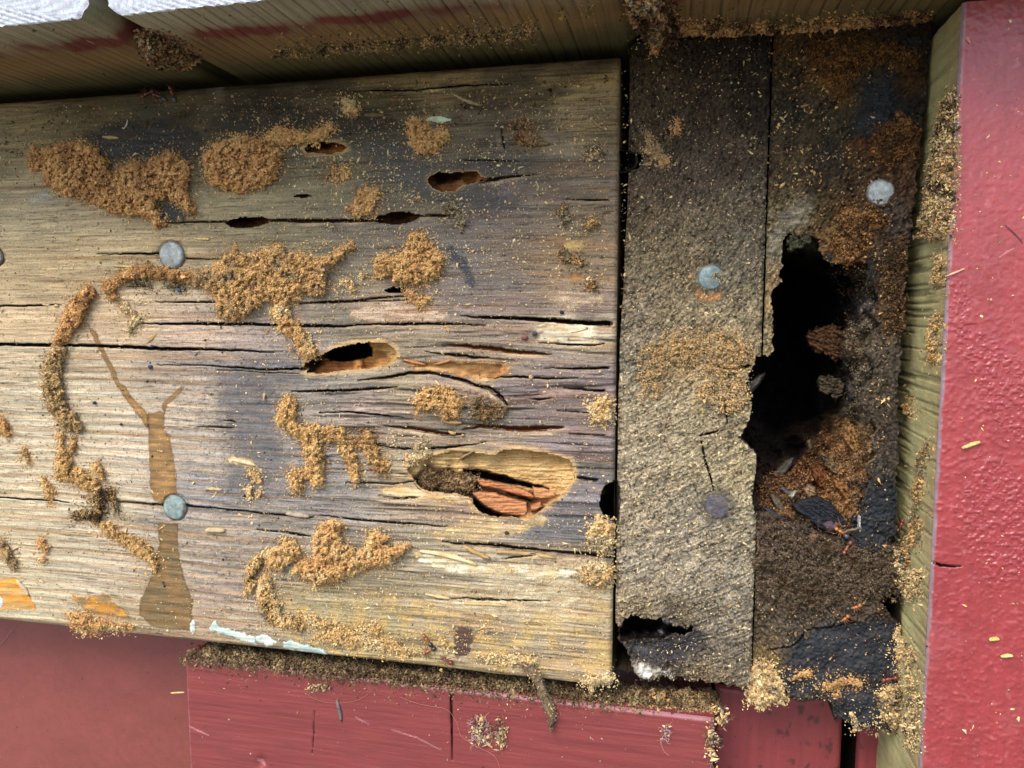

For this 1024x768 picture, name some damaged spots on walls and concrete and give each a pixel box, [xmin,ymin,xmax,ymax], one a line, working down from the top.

crack [0,286,610,450]
crack [699,364,749,491]